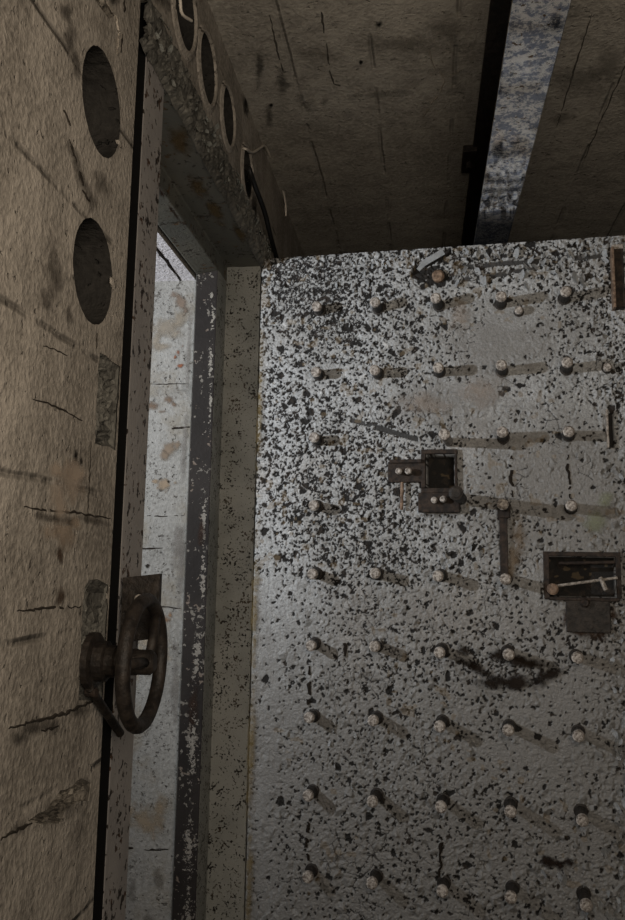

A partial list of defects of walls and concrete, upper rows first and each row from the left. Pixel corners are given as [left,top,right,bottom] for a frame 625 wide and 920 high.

peeling [191,489,208,694]
peeling [186,709,199,793]
peeling [182,814,198,920]